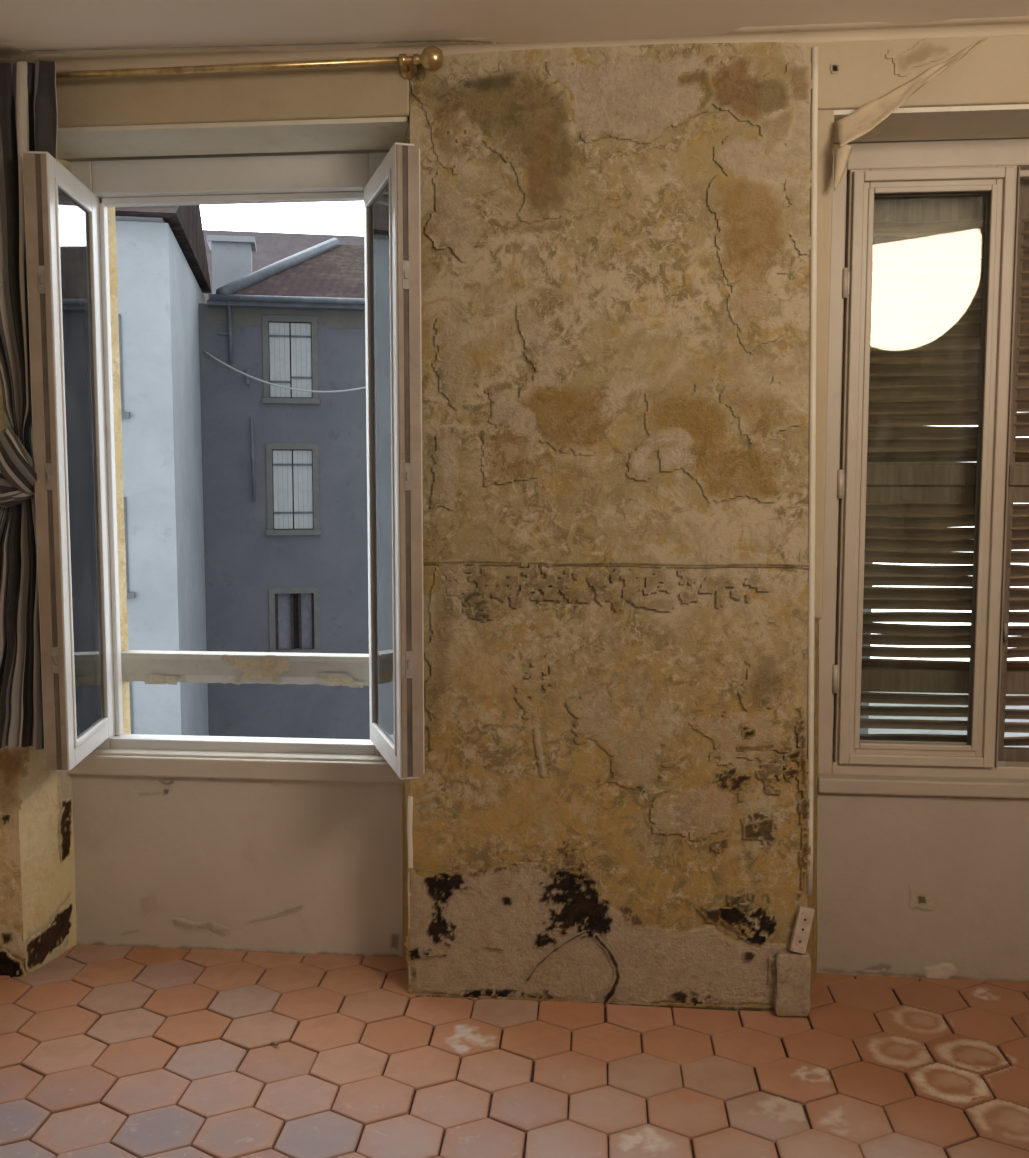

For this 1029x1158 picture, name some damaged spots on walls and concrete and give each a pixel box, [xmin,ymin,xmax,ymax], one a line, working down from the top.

leakage [412,57,583,223]
leakage [678,54,812,157]
leakage [708,174,791,354]
leakage [482,378,613,486]
leakage [645,376,803,502]
flaking render [57,772,73,863]
flaking render [0,890,73,978]
flaking render [404,862,790,1012]
leakage [435,1023,498,1054]
leakage [863,1005,1029,1144]
leakage [616,1125,681,1158]